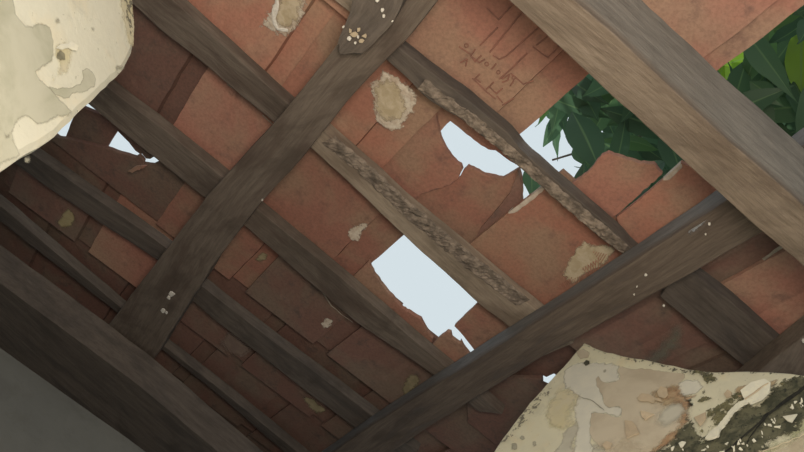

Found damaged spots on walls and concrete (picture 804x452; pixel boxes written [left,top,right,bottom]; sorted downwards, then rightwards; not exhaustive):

flaking render [56,42,79,73]
flaking render [49,69,96,98]
peeling [590,367,687,452]
damp [653,370,804,452]
crack [725,386,804,452]